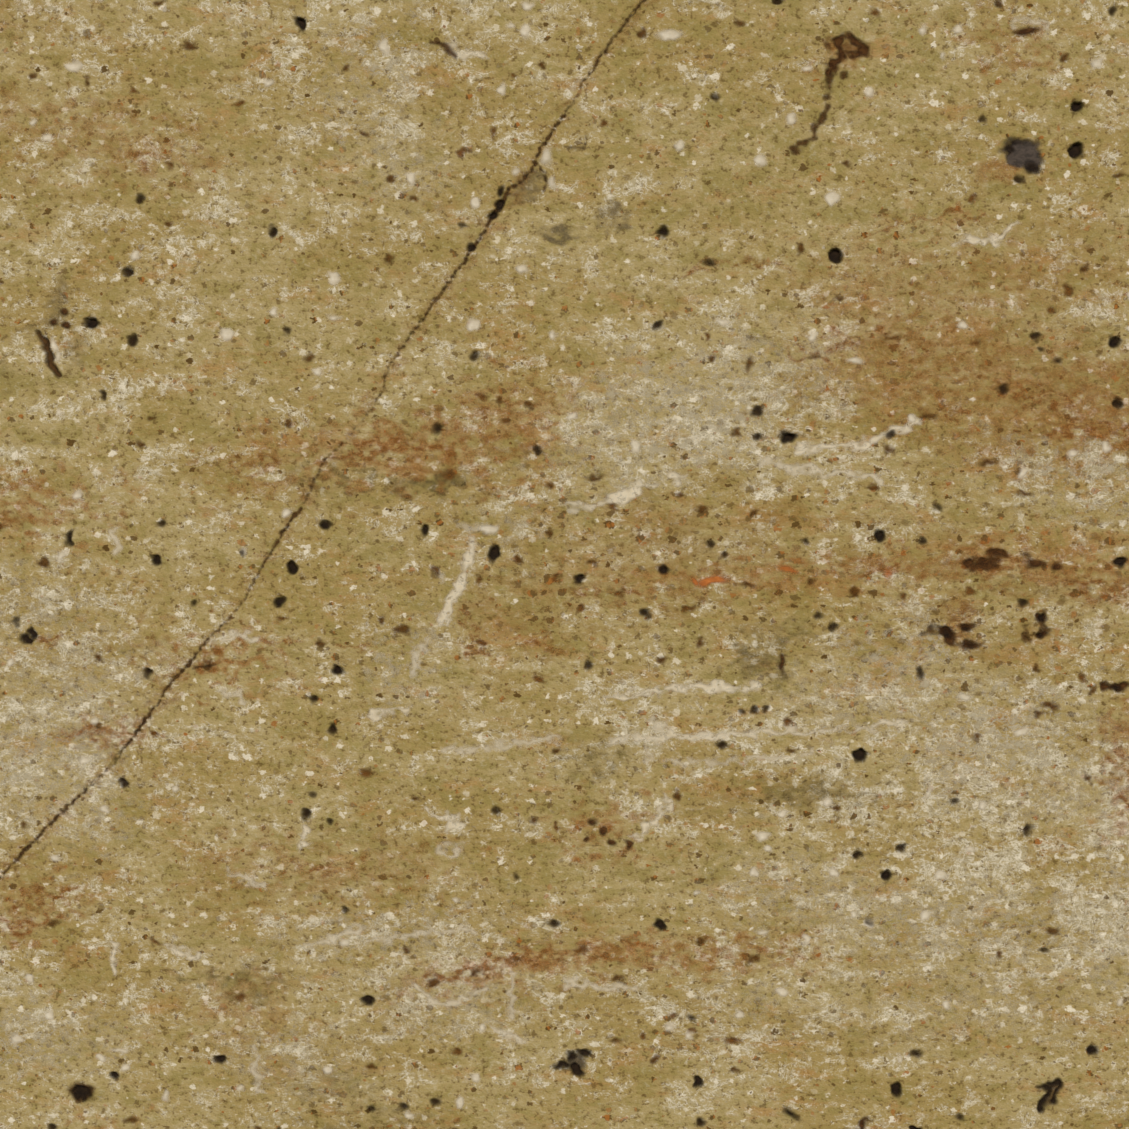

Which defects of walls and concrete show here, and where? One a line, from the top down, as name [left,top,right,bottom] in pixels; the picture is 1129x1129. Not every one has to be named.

crack [580,0,646,87]
crack [379,110,586,396]
crack [124,450,335,748]
crack [0,776,100,878]